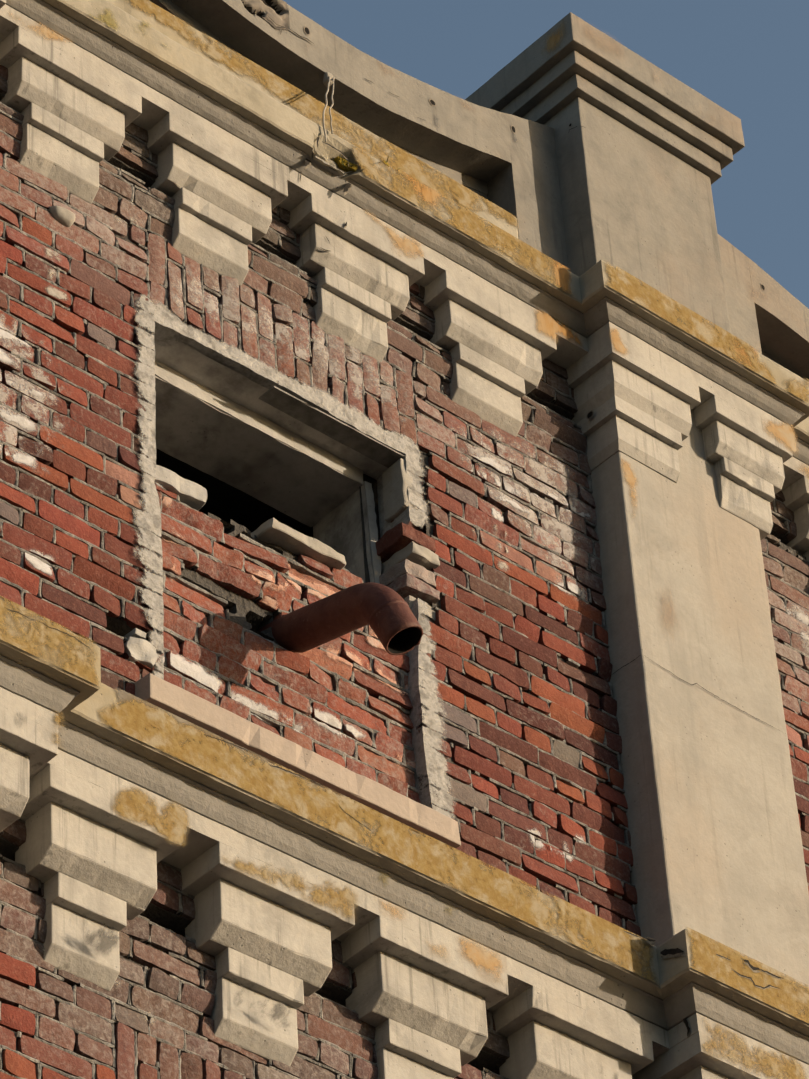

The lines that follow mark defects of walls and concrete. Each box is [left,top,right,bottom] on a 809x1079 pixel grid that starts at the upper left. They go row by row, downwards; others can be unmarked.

spalling [242,0,290,30]
crack [660,948,684,959]
crack [717,954,784,990]